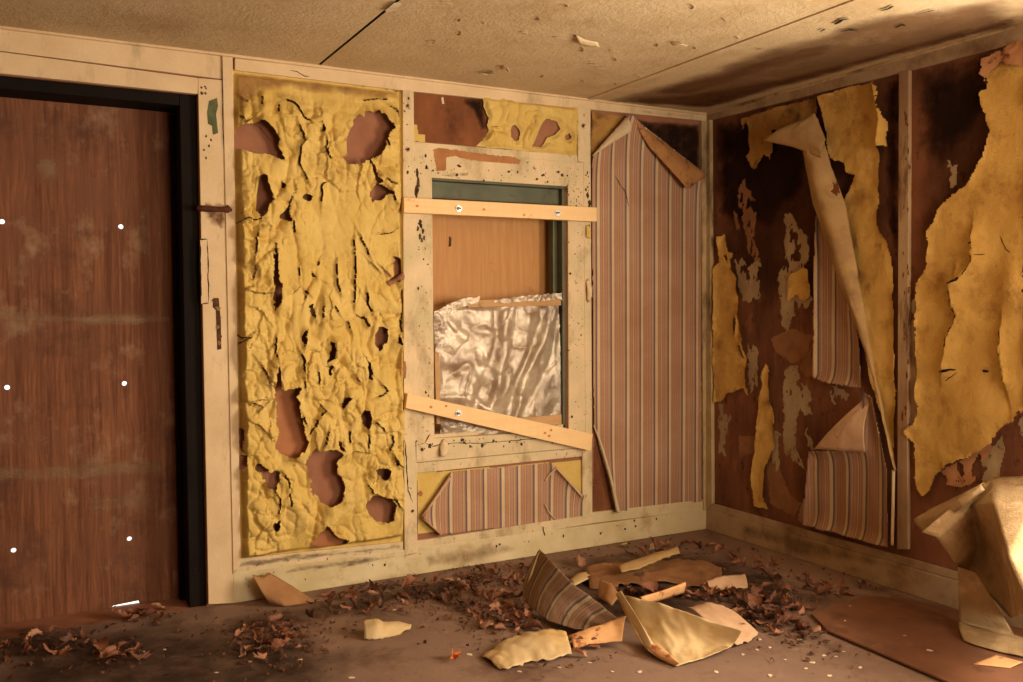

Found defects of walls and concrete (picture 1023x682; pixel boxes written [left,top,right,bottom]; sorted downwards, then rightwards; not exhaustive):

crack [222,60,270,144]
peeling [233,69,592,558]
peeling [771,329,813,377]